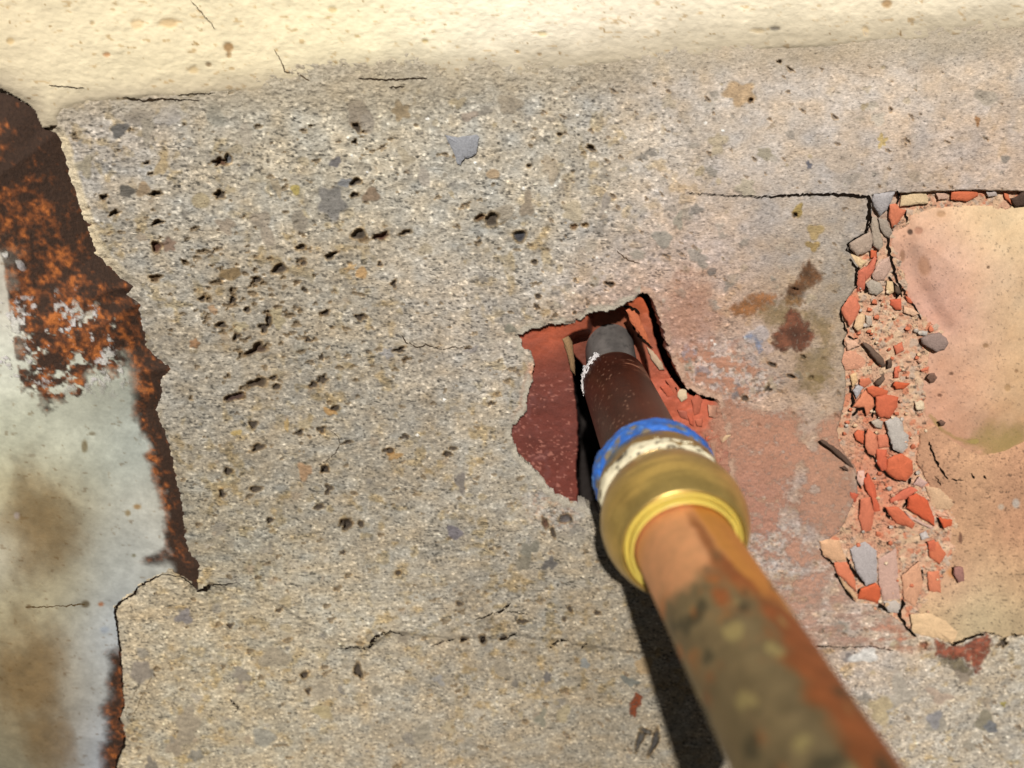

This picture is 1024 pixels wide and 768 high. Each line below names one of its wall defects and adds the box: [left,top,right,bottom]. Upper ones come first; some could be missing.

peeling [5,298,49,384]
peeling [45,303,97,333]
corrosion [0,92,200,591]
peeling [85,338,124,388]
spalling [515,318,566,359]
spalling [505,373,596,516]
spalling [579,287,736,481]
spalling [816,190,1024,644]
crack [114,574,234,768]
crack [334,630,404,650]
crack [432,603,526,646]